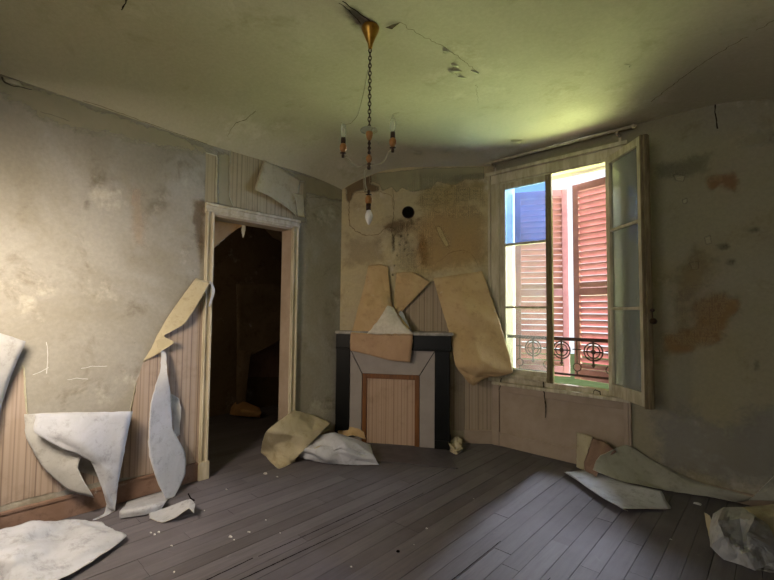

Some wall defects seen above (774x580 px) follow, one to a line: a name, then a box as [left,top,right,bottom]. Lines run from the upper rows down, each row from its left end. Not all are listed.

crack [339,1,370,24]
peeling [229,150,293,219]
peeling [402,281,449,332]
peeling [119,301,203,478]
peeling [0,366,67,507]
peeling [80,472,99,485]